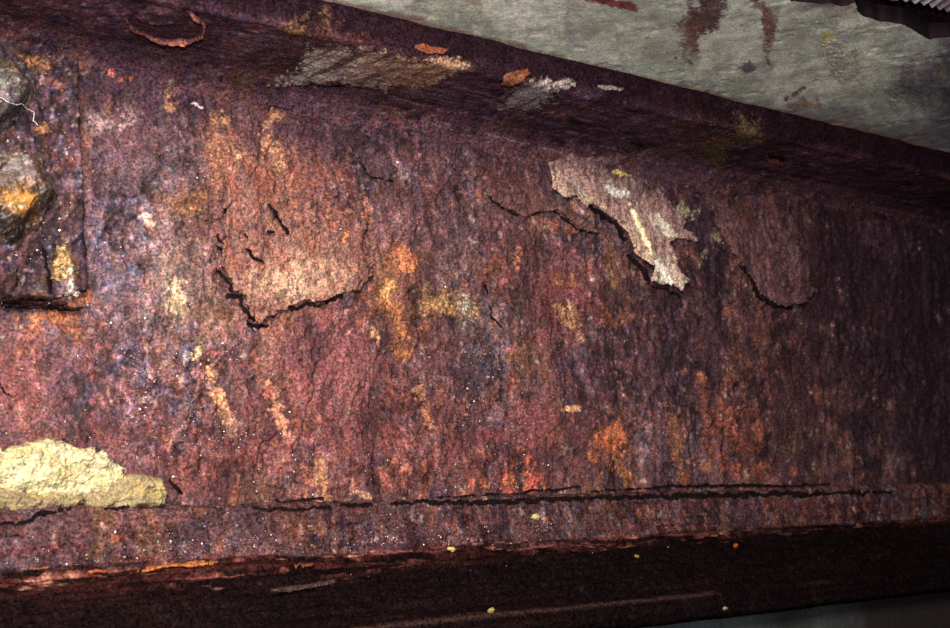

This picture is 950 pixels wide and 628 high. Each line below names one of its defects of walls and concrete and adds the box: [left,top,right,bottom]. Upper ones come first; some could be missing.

peeling [265,45,470,97]
peeling [497,77,576,114]
rust [0,289,96,348]
crack [215,203,343,330]
rust [179,106,479,379]
crack [483,284,502,327]
rust [460,153,698,291]
crack [487,185,682,299]
rust [705,191,818,307]
crack [738,264,805,310]
rust [205,366,237,436]
rust [263,376,294,439]